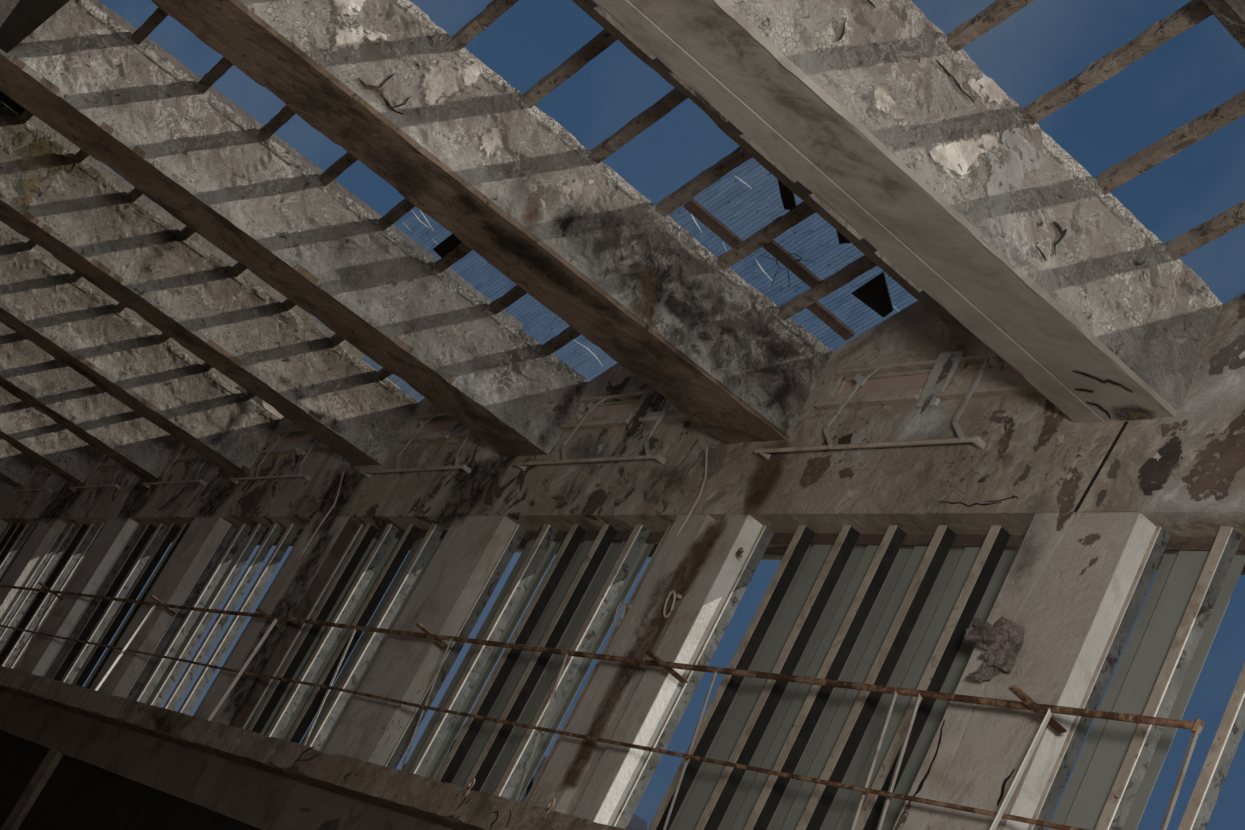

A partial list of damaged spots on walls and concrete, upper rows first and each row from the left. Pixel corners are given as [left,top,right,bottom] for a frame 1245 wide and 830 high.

water stain [13,128,86,212]
peeling [1208,305,1245,376]
crack [1073,370,1133,419]
peeling [799,408,874,489]
peeling [1013,400,1091,531]
peeling [1096,459,1120,507]
peeling [1114,407,1245,502]
crack [894,720,945,830]
crack [997,769,1015,806]